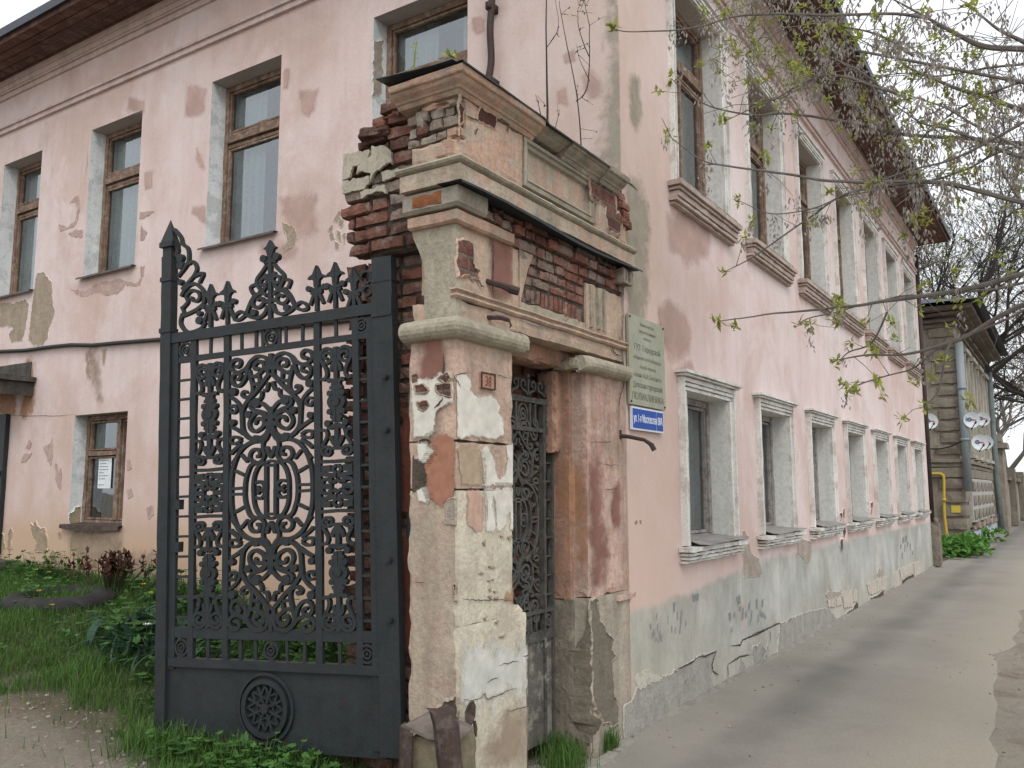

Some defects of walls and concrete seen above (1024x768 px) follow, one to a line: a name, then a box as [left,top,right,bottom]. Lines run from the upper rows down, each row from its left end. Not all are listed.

peeling [341,145,399,199]
flaking render [58,196,83,238]
flaking render [588,175,623,237]
flaking render [0,271,55,347]
flaking render [70,266,145,297]
flaking render [454,237,480,282]
flaking render [411,370,513,547]
flaking render [30,506,82,572]
leakage [558,460,621,585]
flaking render [741,530,762,579]
flaking render [560,597,620,735]
crack [677,617,793,680]